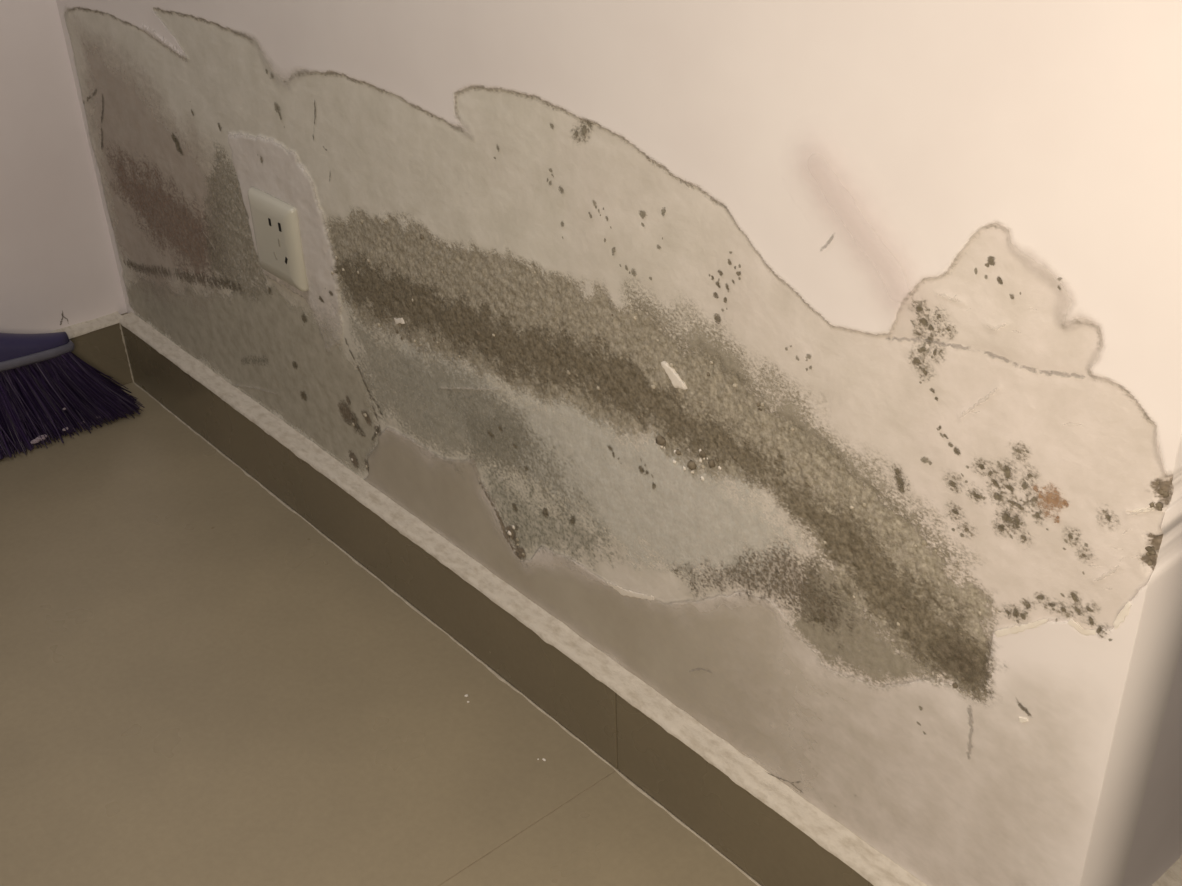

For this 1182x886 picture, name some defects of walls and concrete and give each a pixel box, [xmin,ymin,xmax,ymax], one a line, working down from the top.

damp [108,148,940,767]
peeling [65,8,1174,700]
damp [589,200,1048,567]